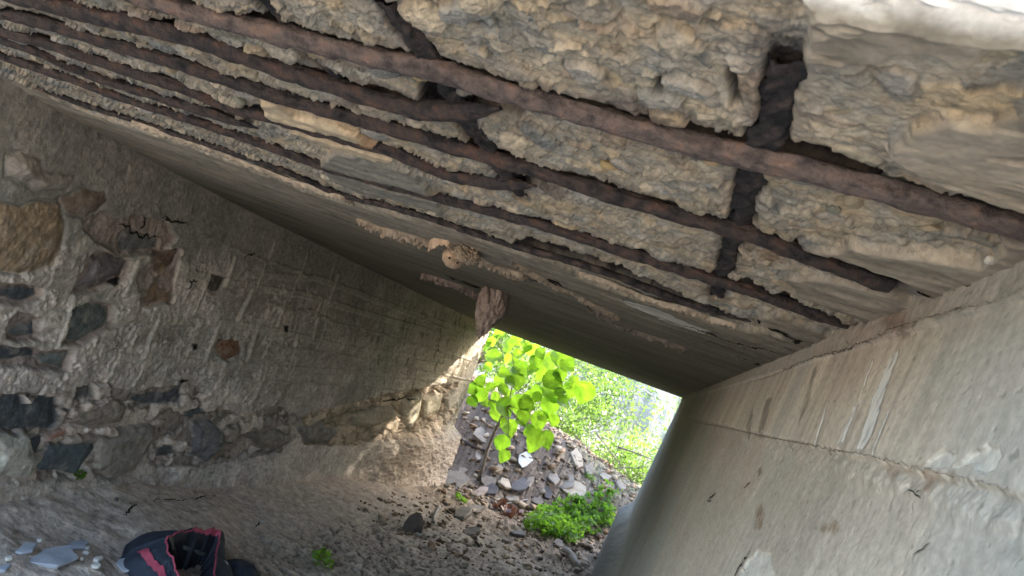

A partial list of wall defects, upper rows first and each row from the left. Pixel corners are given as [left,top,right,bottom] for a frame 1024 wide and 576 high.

spalling [0,0,1024,372]
crack [636,275,1021,385]
crack [696,422,1009,498]
flaking render [926,444,1002,474]